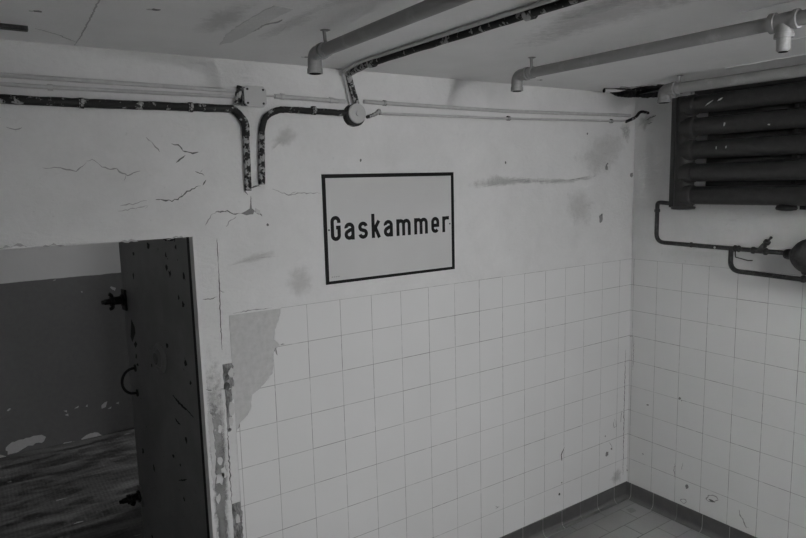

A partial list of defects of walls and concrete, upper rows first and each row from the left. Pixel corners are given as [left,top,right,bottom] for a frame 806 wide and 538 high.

crack [45,159,139,180]
crack [121,137,206,211]
crack [204,211,268,345]
peeling [0,435,46,458]
peeling [207,308,283,538]